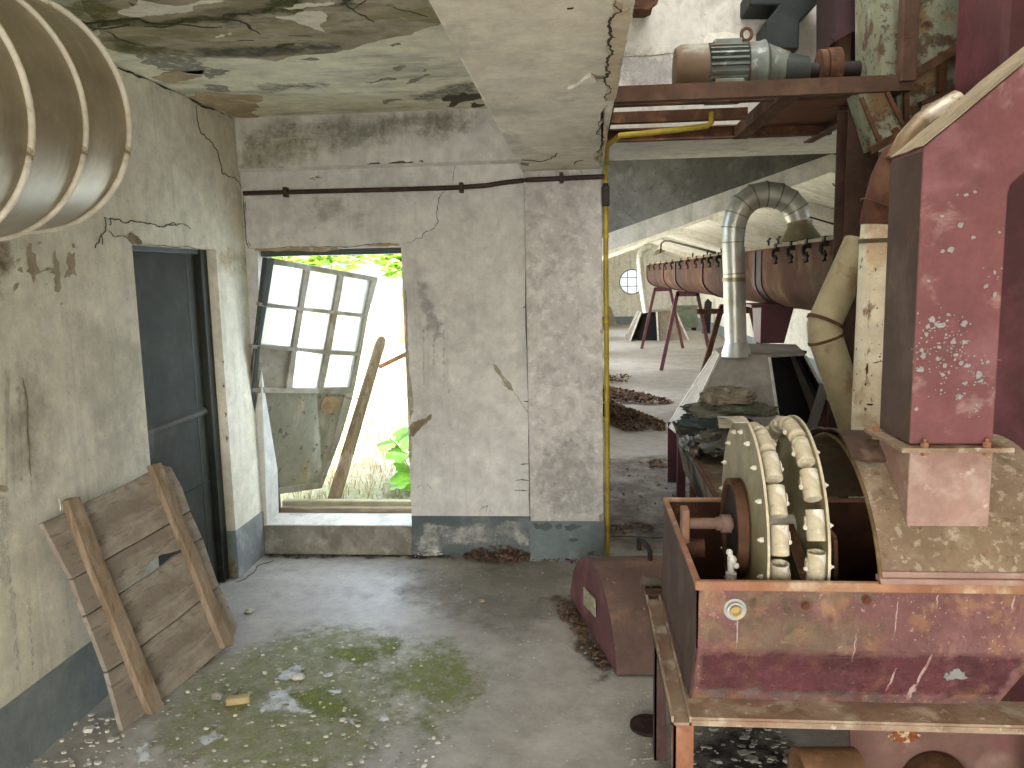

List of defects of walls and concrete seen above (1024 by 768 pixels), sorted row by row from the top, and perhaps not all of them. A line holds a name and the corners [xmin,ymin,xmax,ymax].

crack [81,3,260,47]
spalling [81,0,441,118]
damp [317,84,474,146]
peeling [441,92,485,108]
crack [524,1,674,173]
crack [117,67,381,249]
crack [95,217,215,250]
peeling [18,243,77,305]
peeling [416,521,582,551]
efflorescence [262,664,310,713]
damp [136,743,153,762]
damp [199,732,223,745]